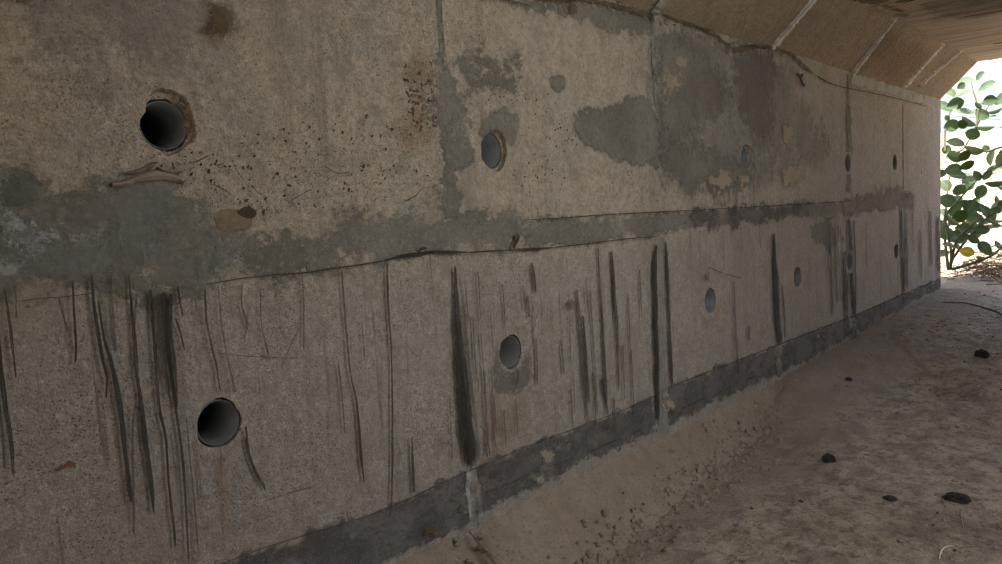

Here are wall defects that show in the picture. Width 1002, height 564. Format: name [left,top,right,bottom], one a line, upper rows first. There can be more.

leakage [455,35,522,97]
crack [211,200,855,284]
leakage [689,200,809,232]
leakage [0,211,59,475]
leakage [58,280,77,363]
leakage [91,274,155,534]
leakage [149,286,198,561]
leakage [195,288,236,393]
leakage [239,210,941,564]